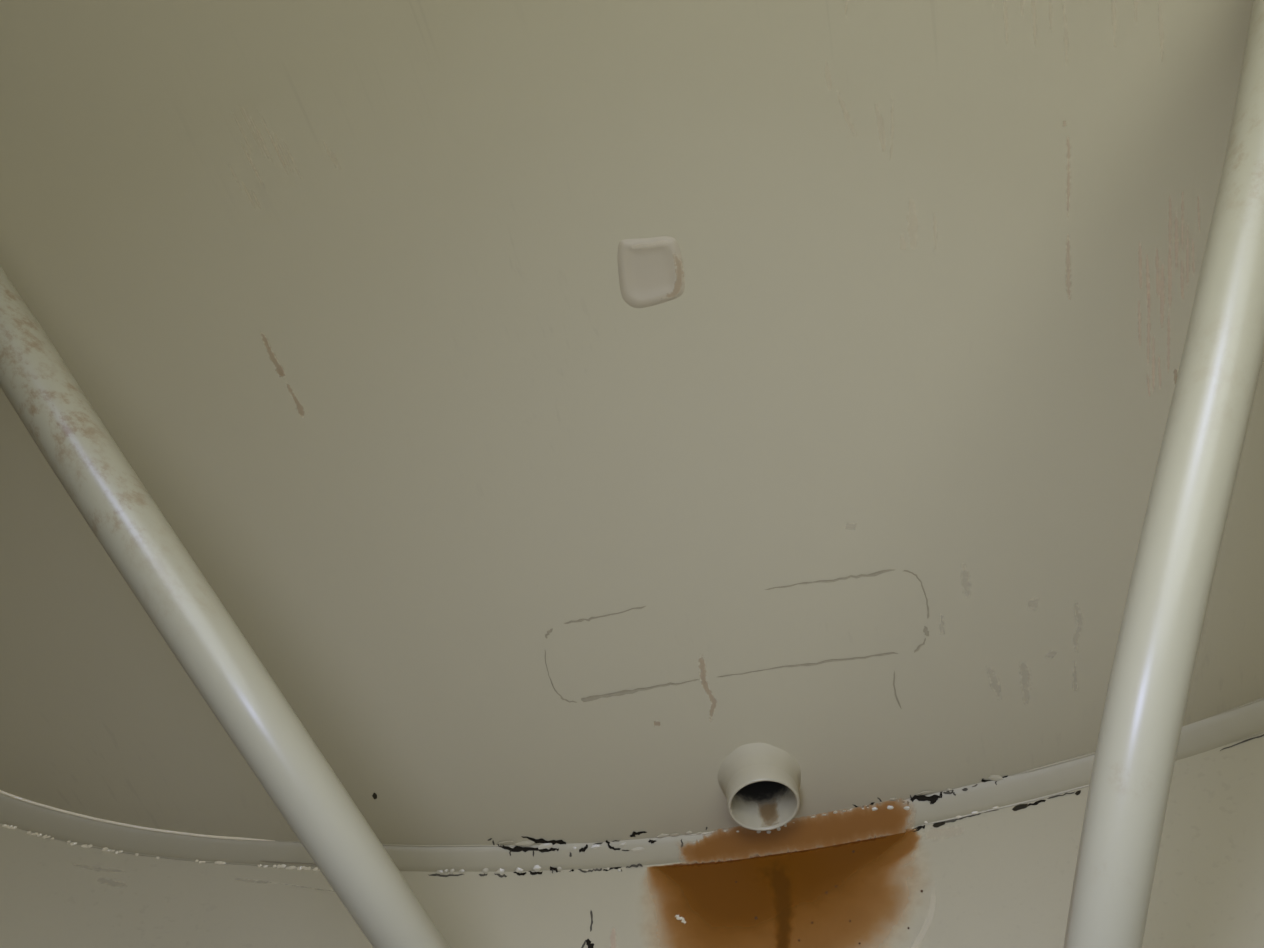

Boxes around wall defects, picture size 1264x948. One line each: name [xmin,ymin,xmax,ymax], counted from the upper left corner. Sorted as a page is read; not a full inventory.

peeling [581,911,594,948]
rust [647,799,923,948]